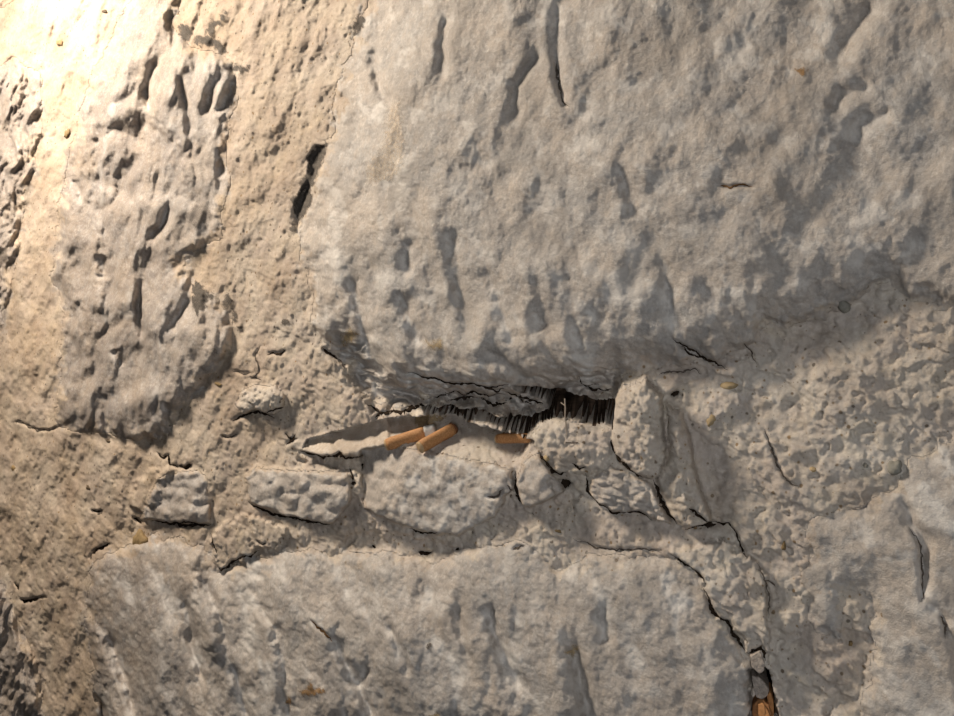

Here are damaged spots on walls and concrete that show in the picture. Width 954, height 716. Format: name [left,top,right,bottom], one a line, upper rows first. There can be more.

crack [368,372,543,418]
spalling [424,386,615,438]
crack [580,379,609,392]
crack [659,339,727,397]
crack [764,429,800,487]
crack [487,474,522,504]
crack [409,528,436,555]
crack [539,440,775,618]
crack [577,541,766,658]